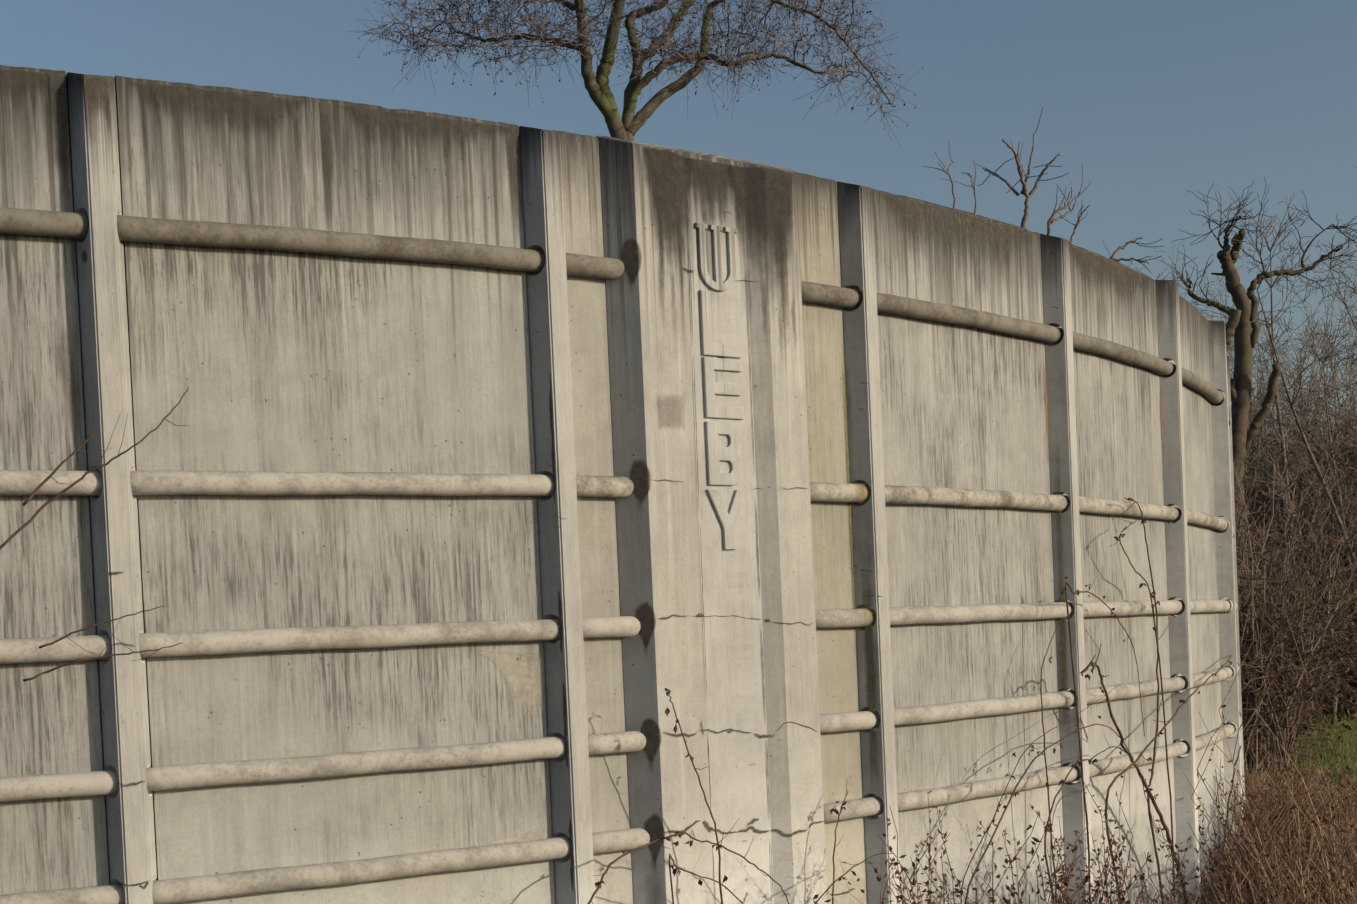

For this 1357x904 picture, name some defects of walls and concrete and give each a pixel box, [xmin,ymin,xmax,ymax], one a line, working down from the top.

water stain [137,82,300,127]
water stain [320,102,333,202]
water stain [348,105,521,193]
water stain [644,147,794,301]
crack [656,205,824,904]
crack [119,881,149,889]